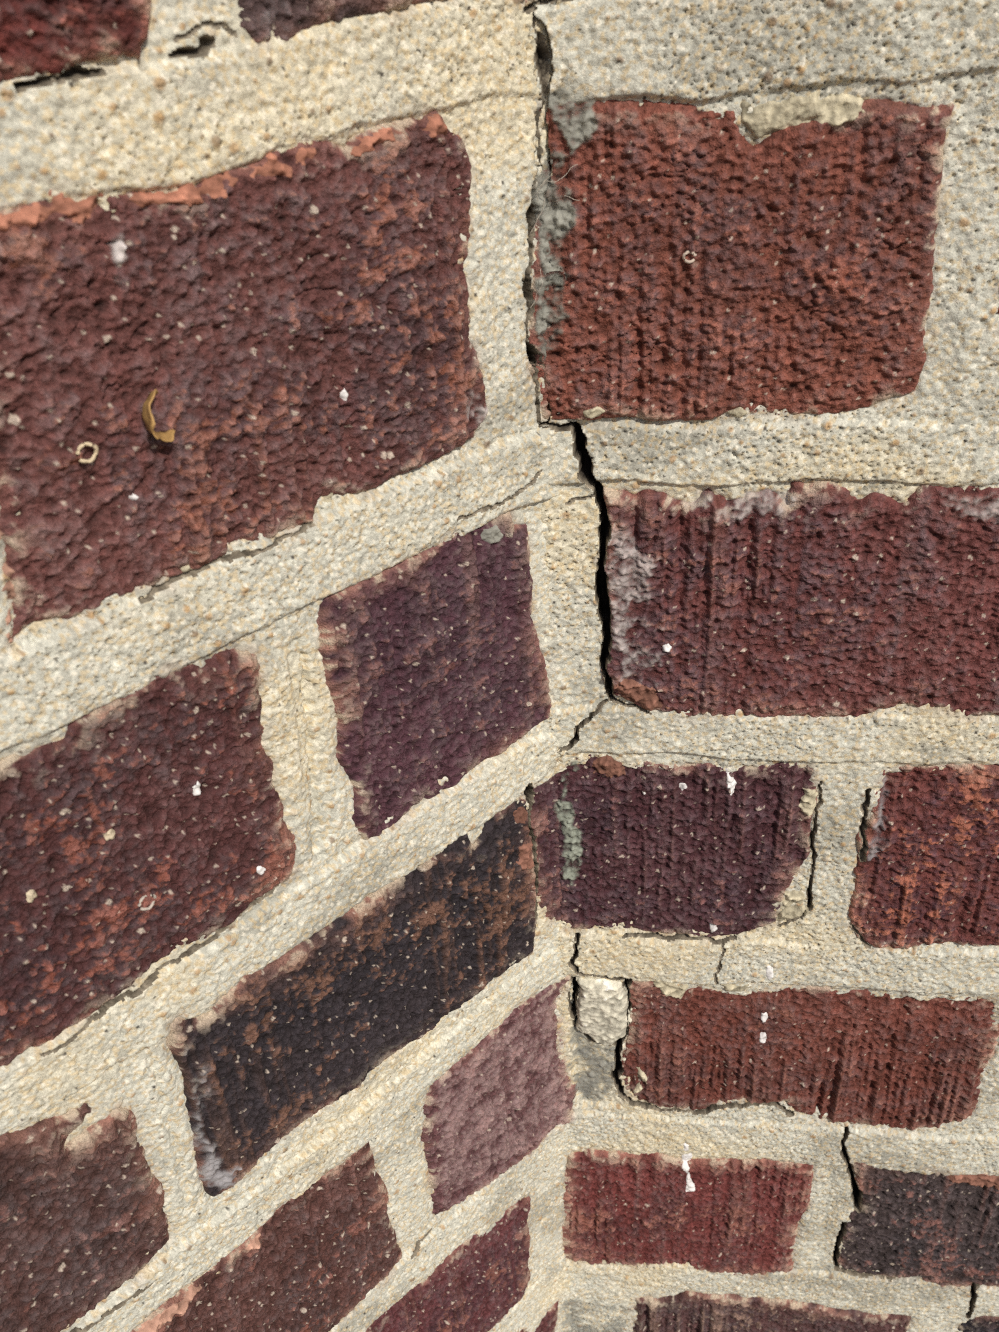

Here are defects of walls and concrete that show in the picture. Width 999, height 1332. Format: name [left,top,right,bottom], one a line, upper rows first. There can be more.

crack [522,0,652,753]
crack [457,469,543,522]
crack [524,783,539,920]
peeling [570,977,632,1099]
peeling [633,1067,648,1094]
crack [832,1126,896,1282]
crack [965,1282,981,1319]